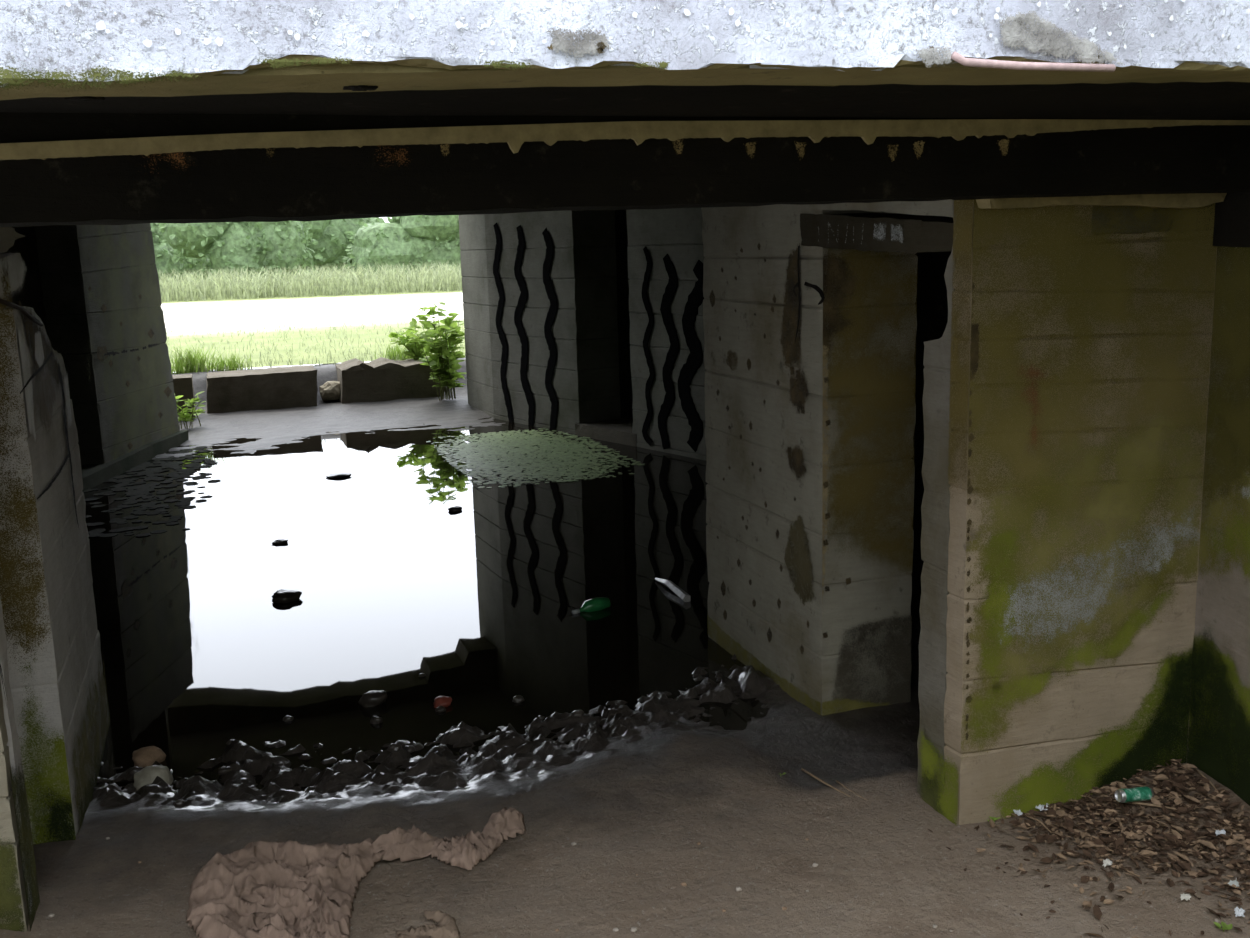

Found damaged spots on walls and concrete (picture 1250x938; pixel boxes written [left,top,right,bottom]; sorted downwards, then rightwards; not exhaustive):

spalling [547,26,611,61]
spalling [914,11,1125,72]
damp [948,200,973,502]
damp [0,272,52,676]
spalling [779,243,861,618]
damp [994,502,1200,654]
damp [0,836,25,932]